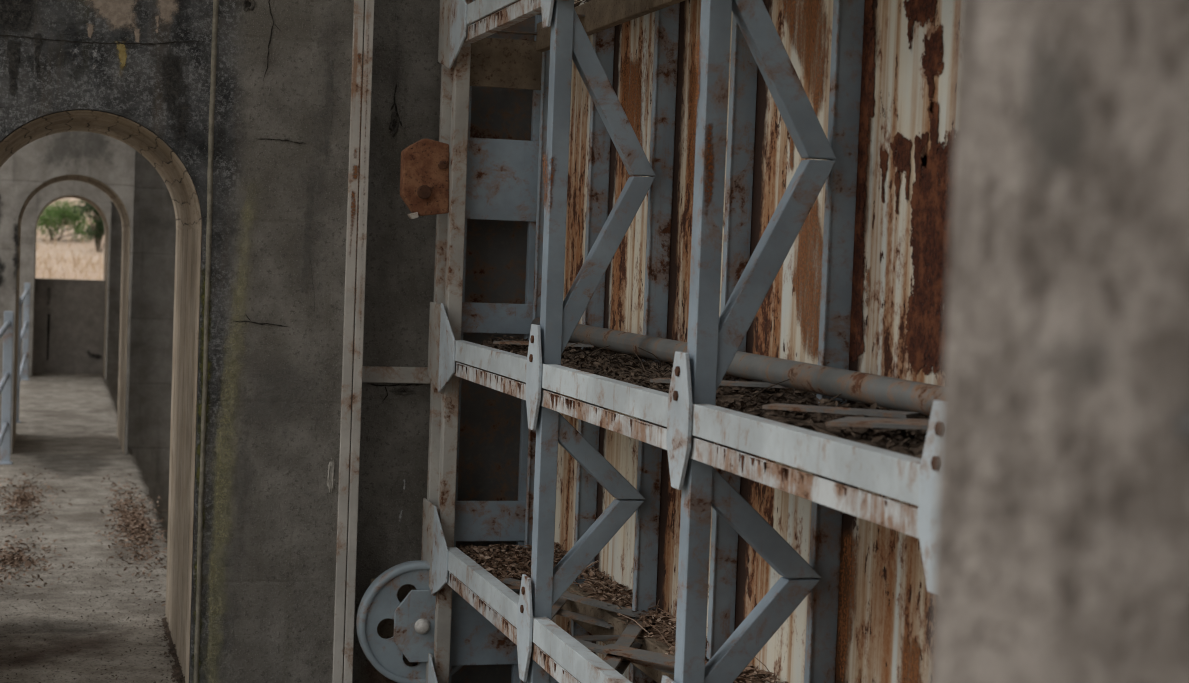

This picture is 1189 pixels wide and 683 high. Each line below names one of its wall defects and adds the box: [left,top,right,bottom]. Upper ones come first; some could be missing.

water stain [0,0,42,96]
corrosion [783,0,826,116]
crack [259,137,306,145]
corrosion [350,75,368,253]
corrosion [849,0,955,377]
corrosion [793,199,823,358]
corrosion [549,393,616,420]
corrosion [836,533,861,683]
corrosion [898,636,922,683]